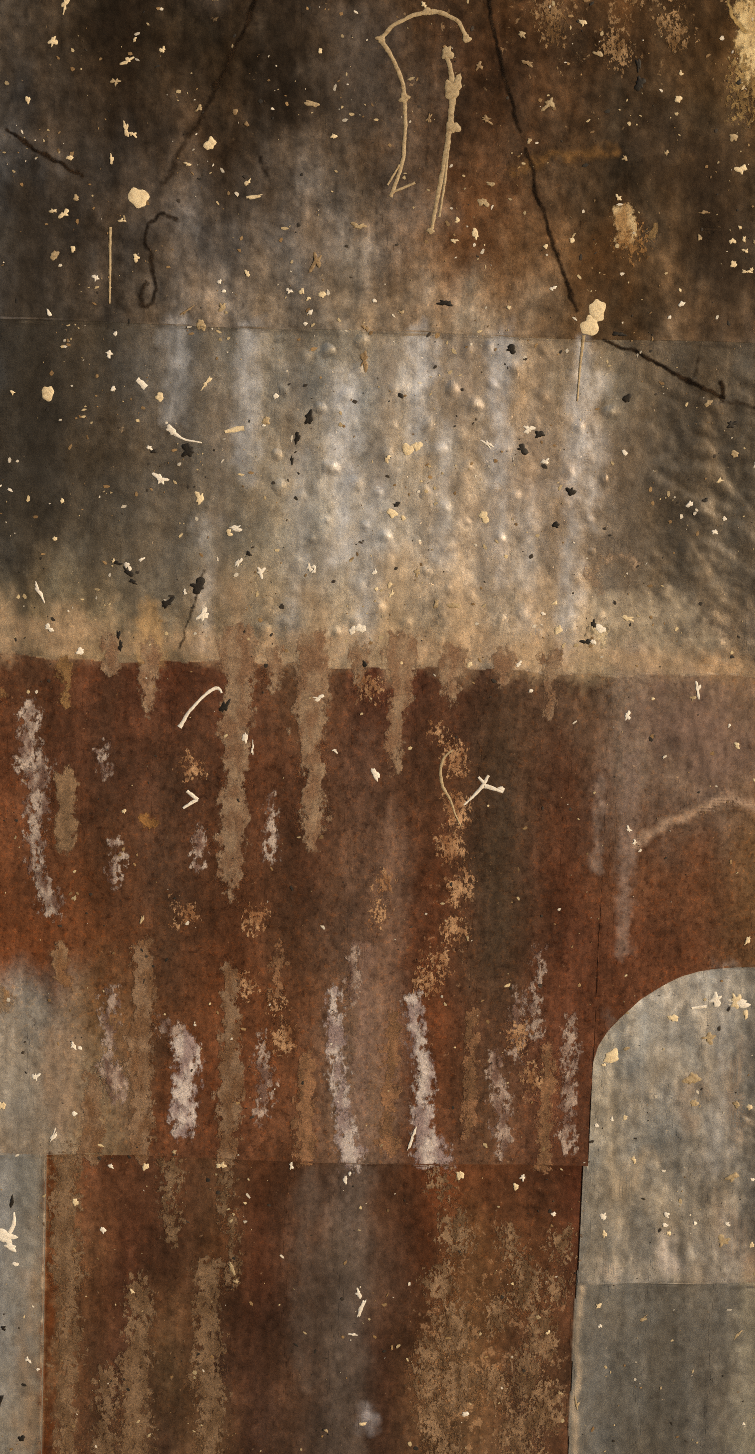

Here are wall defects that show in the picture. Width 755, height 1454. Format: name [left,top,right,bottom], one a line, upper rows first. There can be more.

crack [6,128,84,177]
crack [167,0,257,178]
leakage [185,0,419,146]
leakage [363,170,466,263]
crack [488,0,578,311]
leakage [0,122,160,616]
crack [603,339,754,409]
leakage [3,631,61,787]
leakage [74,310,755,1454]
leakage [0,1142,24,1418]